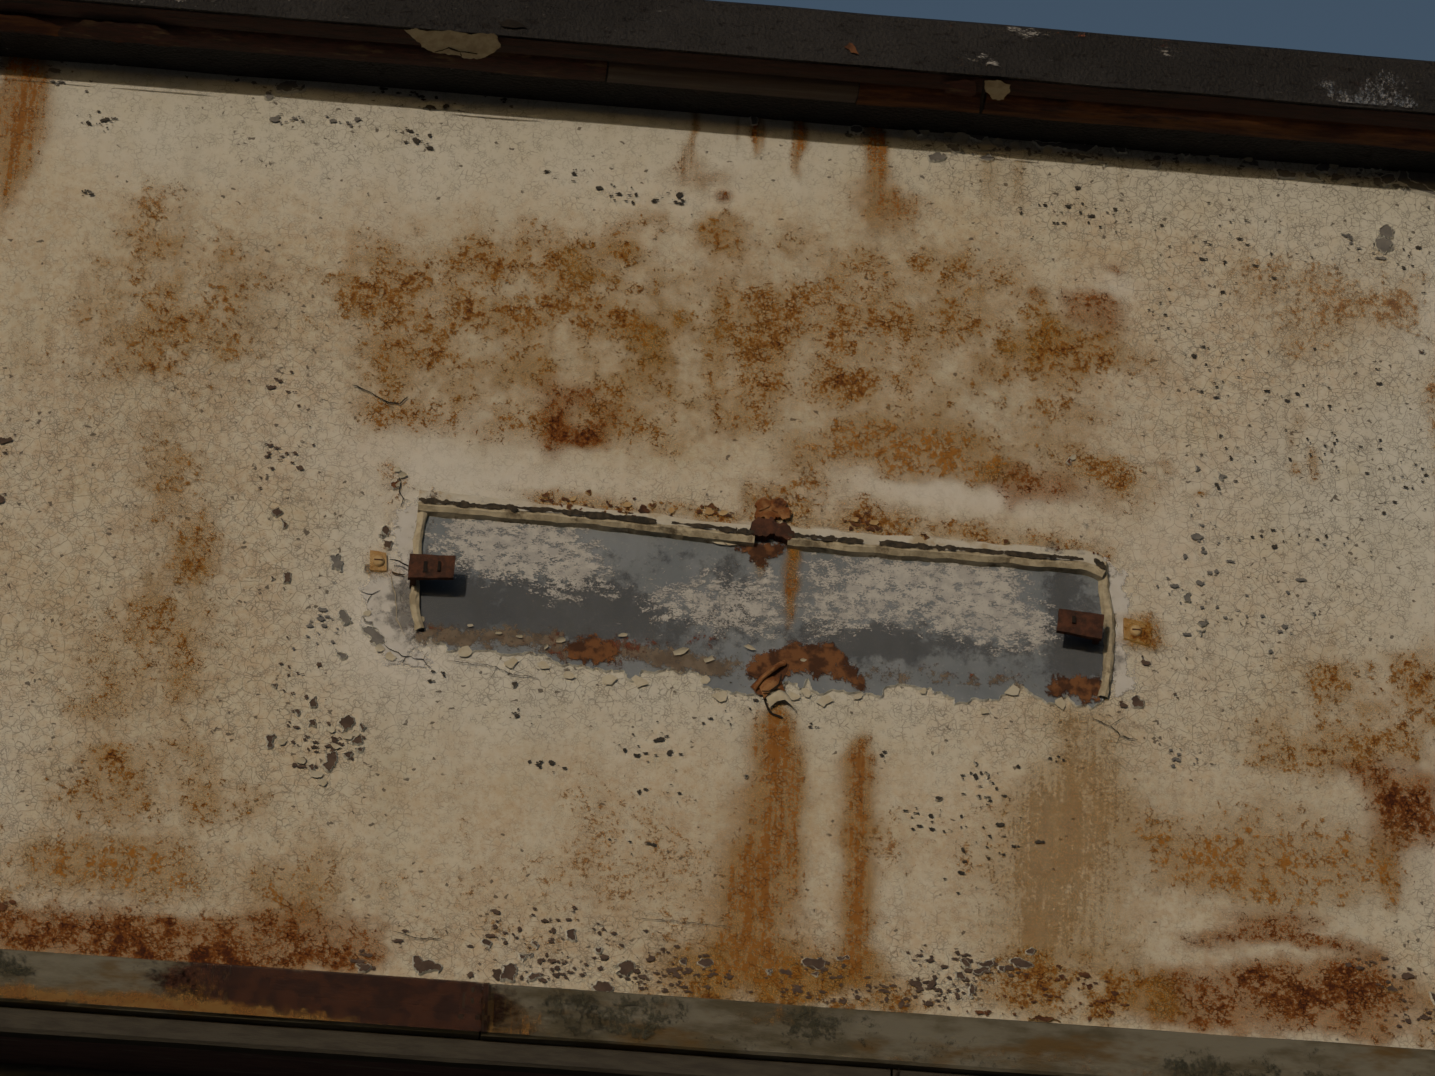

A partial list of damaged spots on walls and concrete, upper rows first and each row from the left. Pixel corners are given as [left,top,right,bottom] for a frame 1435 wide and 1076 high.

rust [0,57,49,205]
rust [302,112,1168,618]
rust [0,421,540,1035]
peeling [329,553,344,583]
peeling [378,525,394,551]
peeling [619,721,696,803]
rust [523,703,934,1023]
peeling [410,478,1145,725]
rust [743,640,870,691]
peeling [903,796,1046,879]
peeling [960,761,1011,808]
rust [974,649,1435,1050]